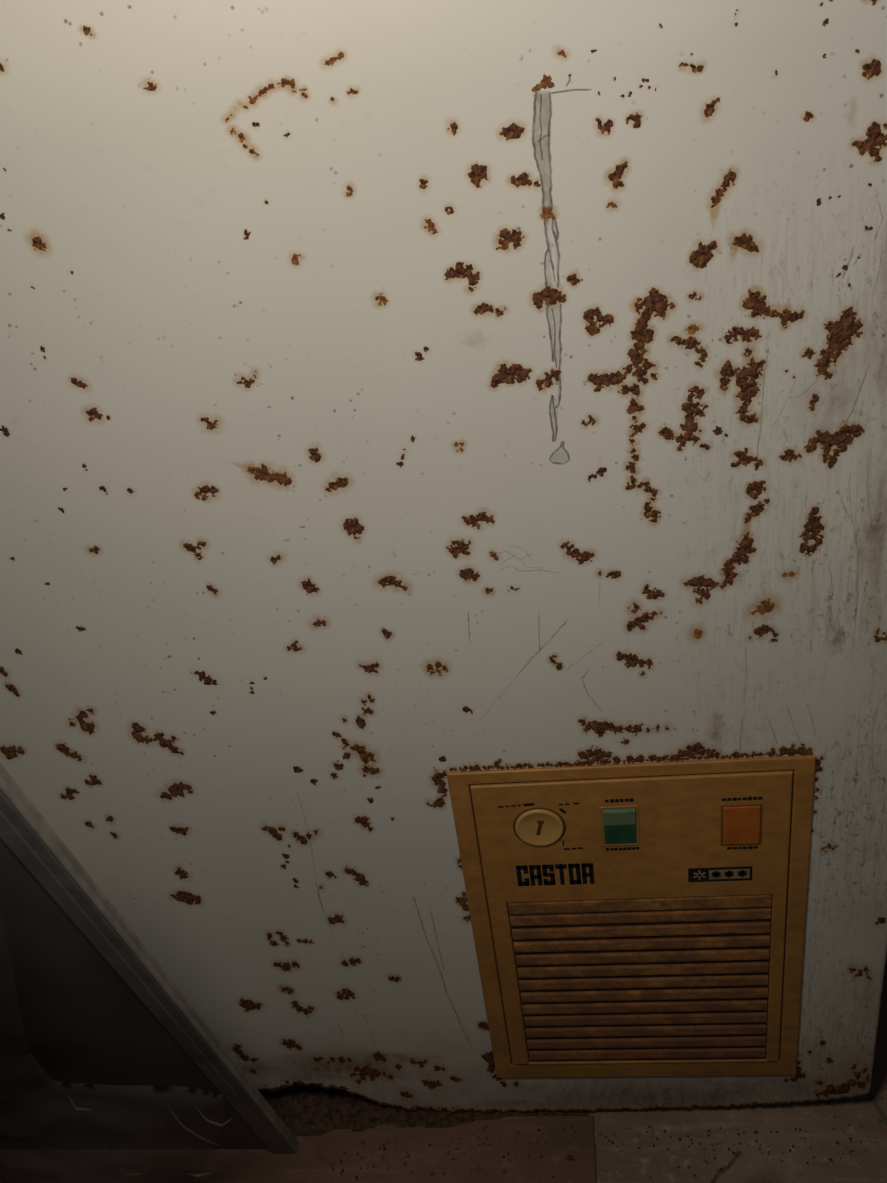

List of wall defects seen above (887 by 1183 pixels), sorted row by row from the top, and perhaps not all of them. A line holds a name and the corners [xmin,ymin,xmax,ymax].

rust [225,78,308,157]
rust [851,121,887,162]
rust [444,262,480,292]
rust [473,302,506,316]
rust [801,306,863,380]
rust [583,287,805,524]
rust [779,421,864,469]
rust [246,462,292,487]
rust [683,448,770,605]
rust [799,506,825,556]
rust [131,722,184,755]
rust [426,719,823,814]